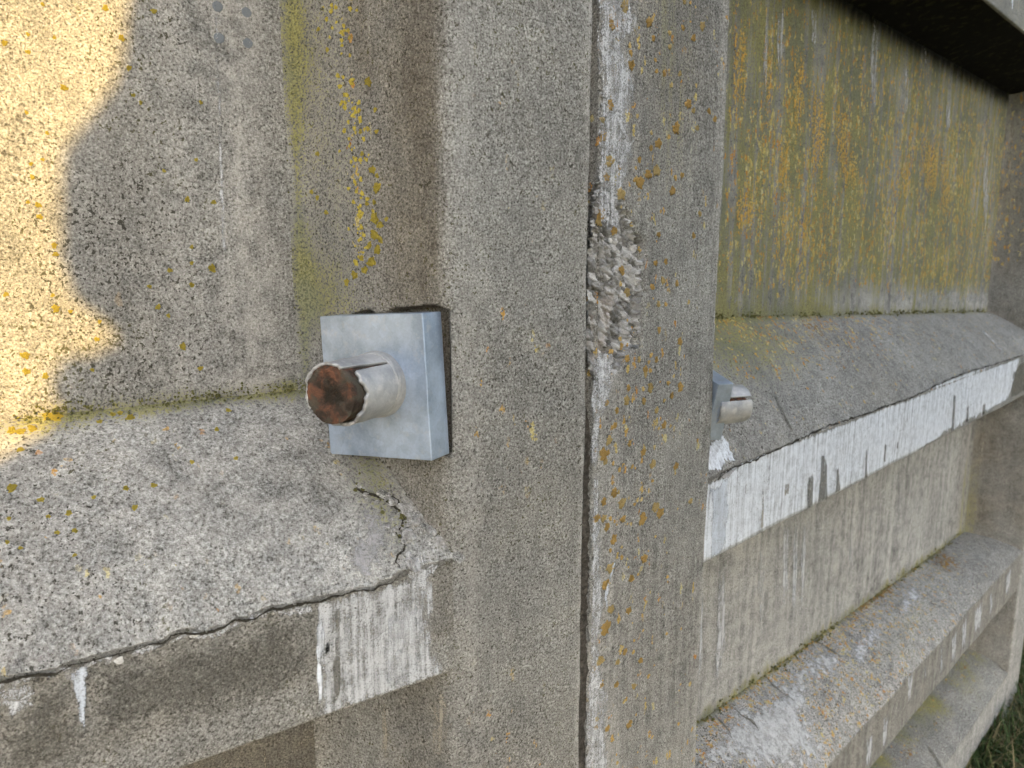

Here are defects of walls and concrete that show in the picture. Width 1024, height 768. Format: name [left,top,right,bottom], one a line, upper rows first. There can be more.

water stain [733,19,747,122]
water stain [763,10,783,136]
water stain [779,9,859,197]
spalling [585,175,646,393]
crack [0,482,466,686]